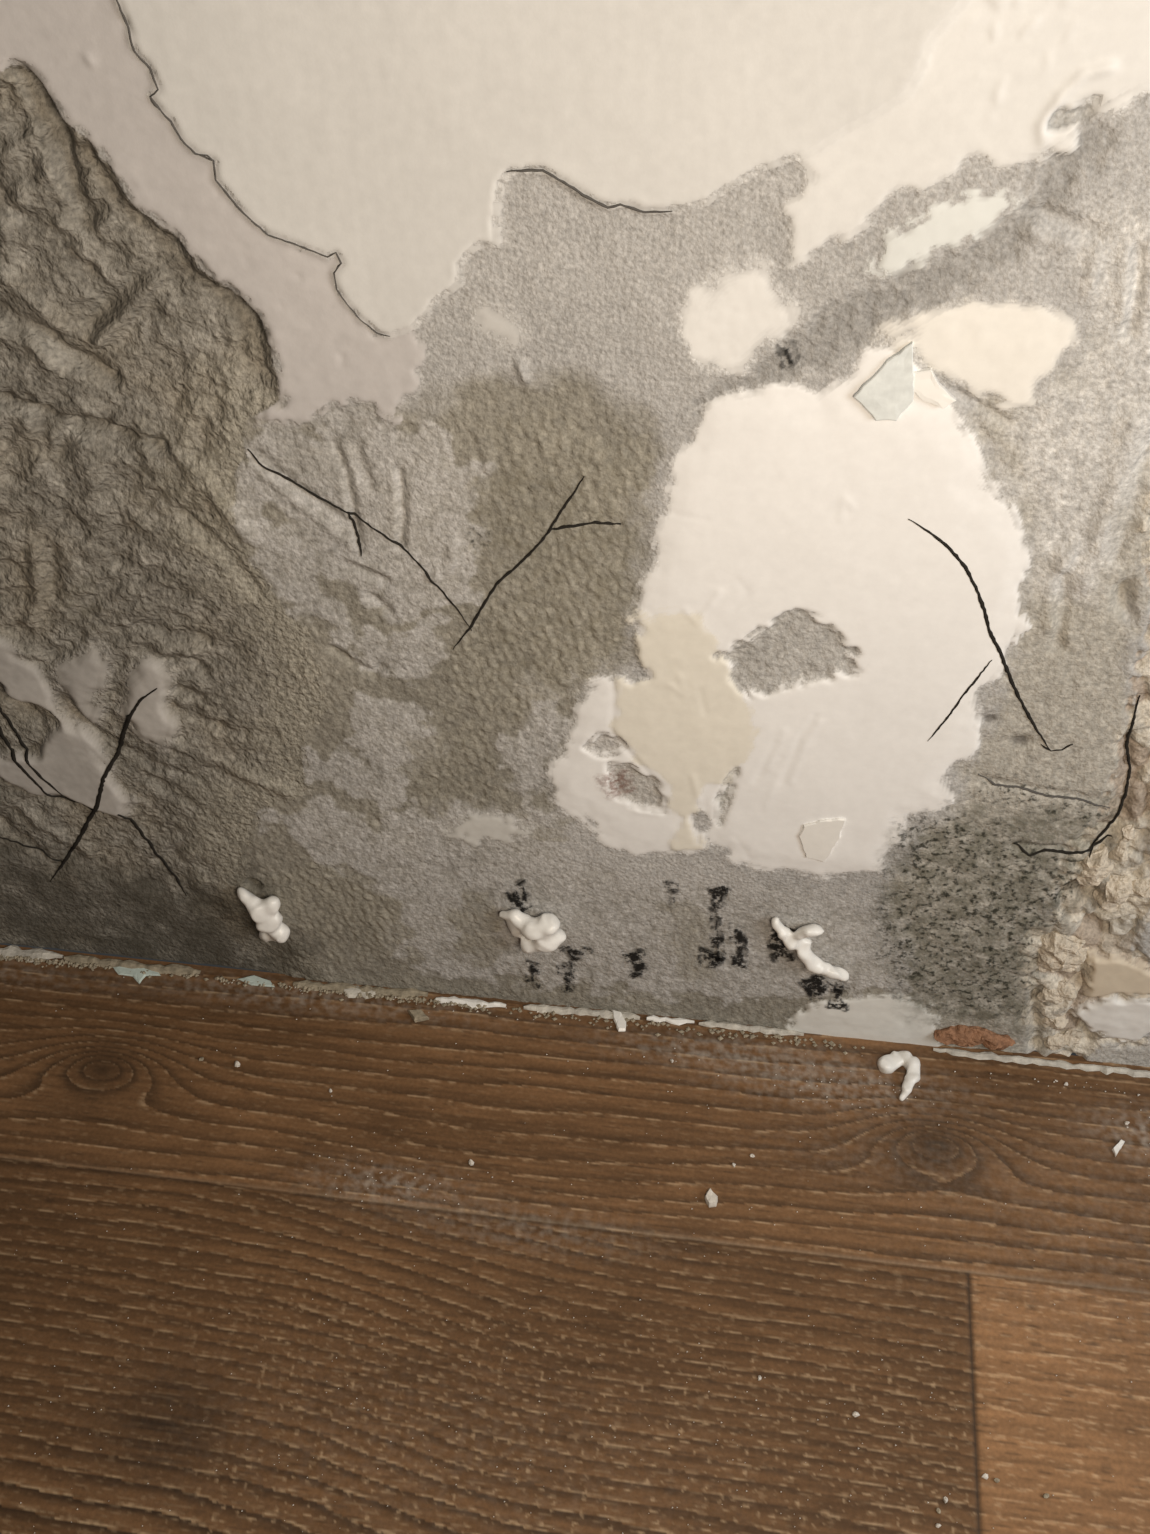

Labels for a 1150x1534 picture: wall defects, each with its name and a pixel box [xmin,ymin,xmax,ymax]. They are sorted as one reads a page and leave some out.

crack [247,449,621,650]
flaking render [0,0,1150,1067]
crack [908,519,1073,752]
crack [0,688,187,896]
crack [978,695,1141,858]